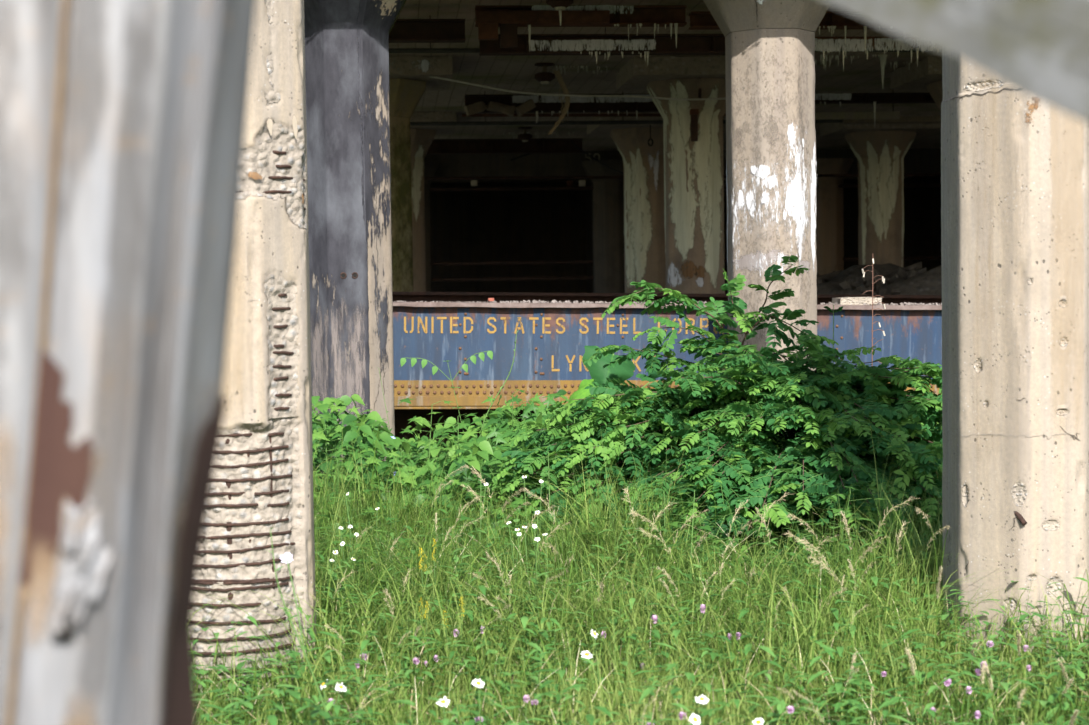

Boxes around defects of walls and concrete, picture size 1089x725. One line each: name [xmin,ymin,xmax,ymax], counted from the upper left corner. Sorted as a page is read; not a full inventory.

water stain [528,39,656,51]
crack [947,88,1017,101]
peeling [191,0,405,705]
spalling [1011,482,1028,506]
spalling [1027,574,1064,596]